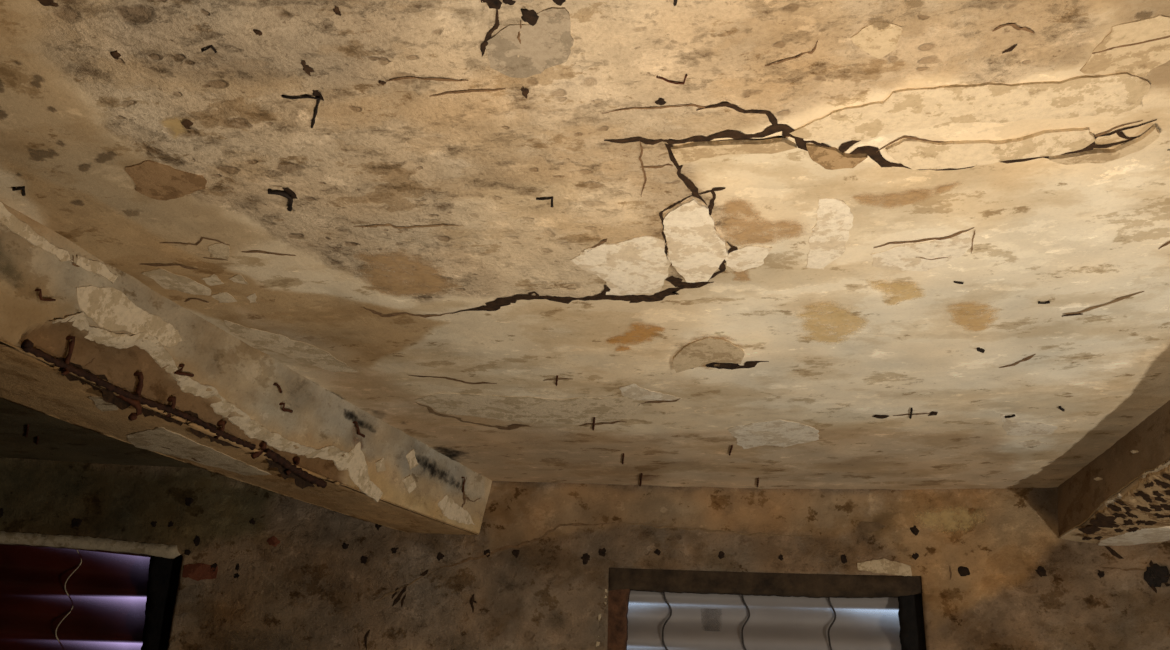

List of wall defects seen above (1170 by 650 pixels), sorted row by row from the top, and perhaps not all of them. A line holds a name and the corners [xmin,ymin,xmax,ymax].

crack [993,24,1034,54]
crack [386,77,506,97]
crack [602,35,1170,260]
peeling [125,155,207,201]
crack [353,222,458,230]
peeling [570,198,772,295]
crack [363,282,713,318]
peeling [0,202,386,502]
spalling [673,336,769,373]
peeling [402,449,419,494]
peeling [438,495,475,525]
spalling [1078,461,1170,546]